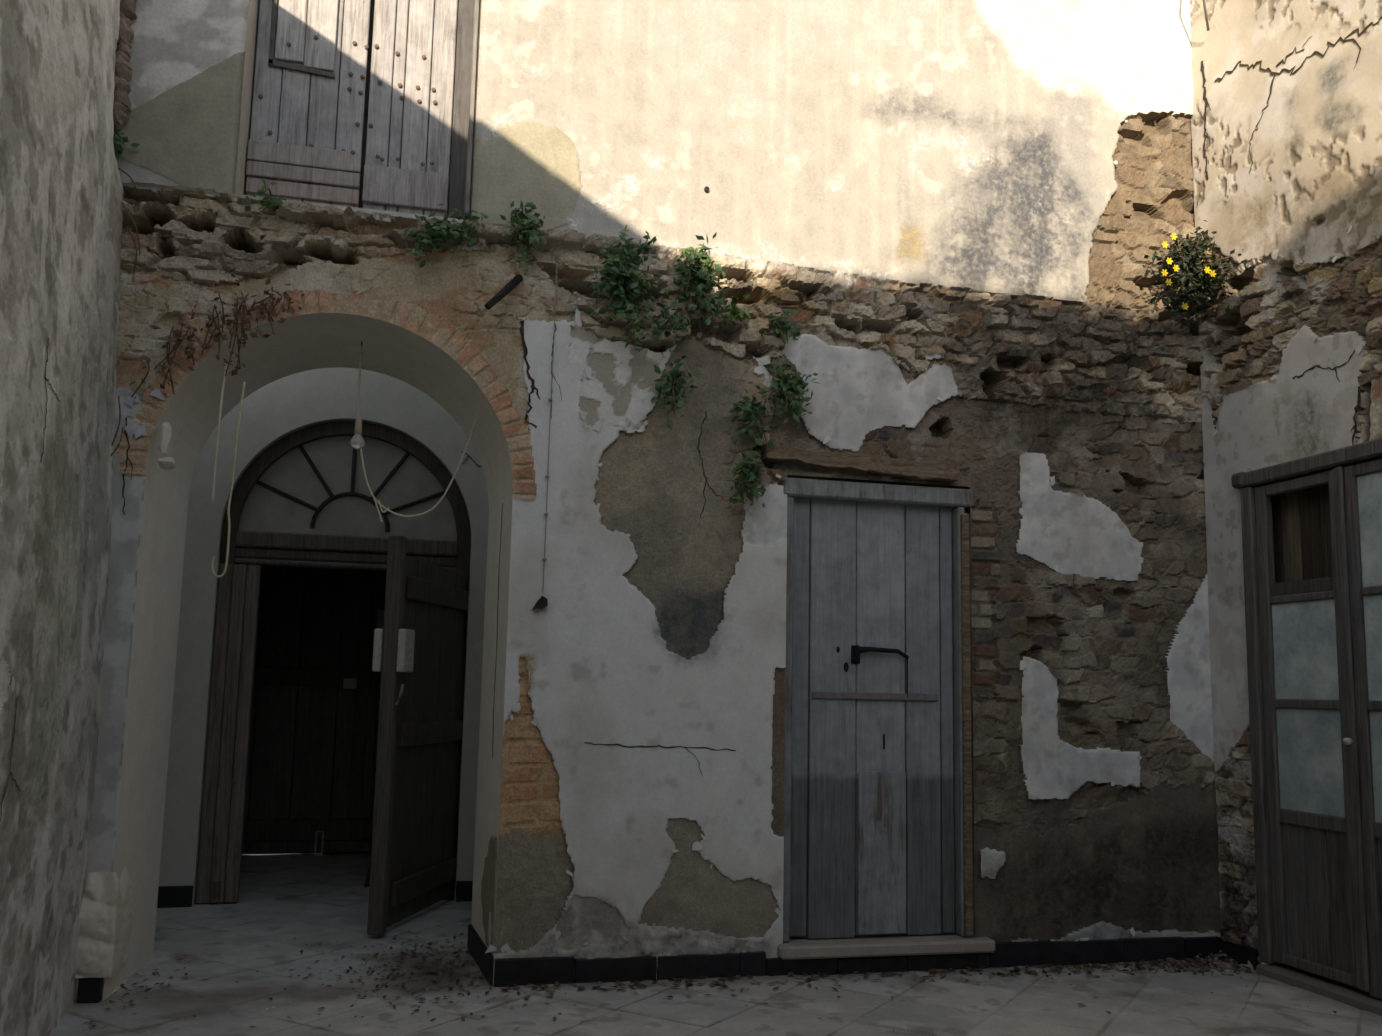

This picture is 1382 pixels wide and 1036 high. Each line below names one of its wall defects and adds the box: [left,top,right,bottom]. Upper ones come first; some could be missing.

crack [1200,16,1382,180]
crack [1293,349,1361,445]
flaking render [116,111,1382,971]
crack [584,742,736,774]